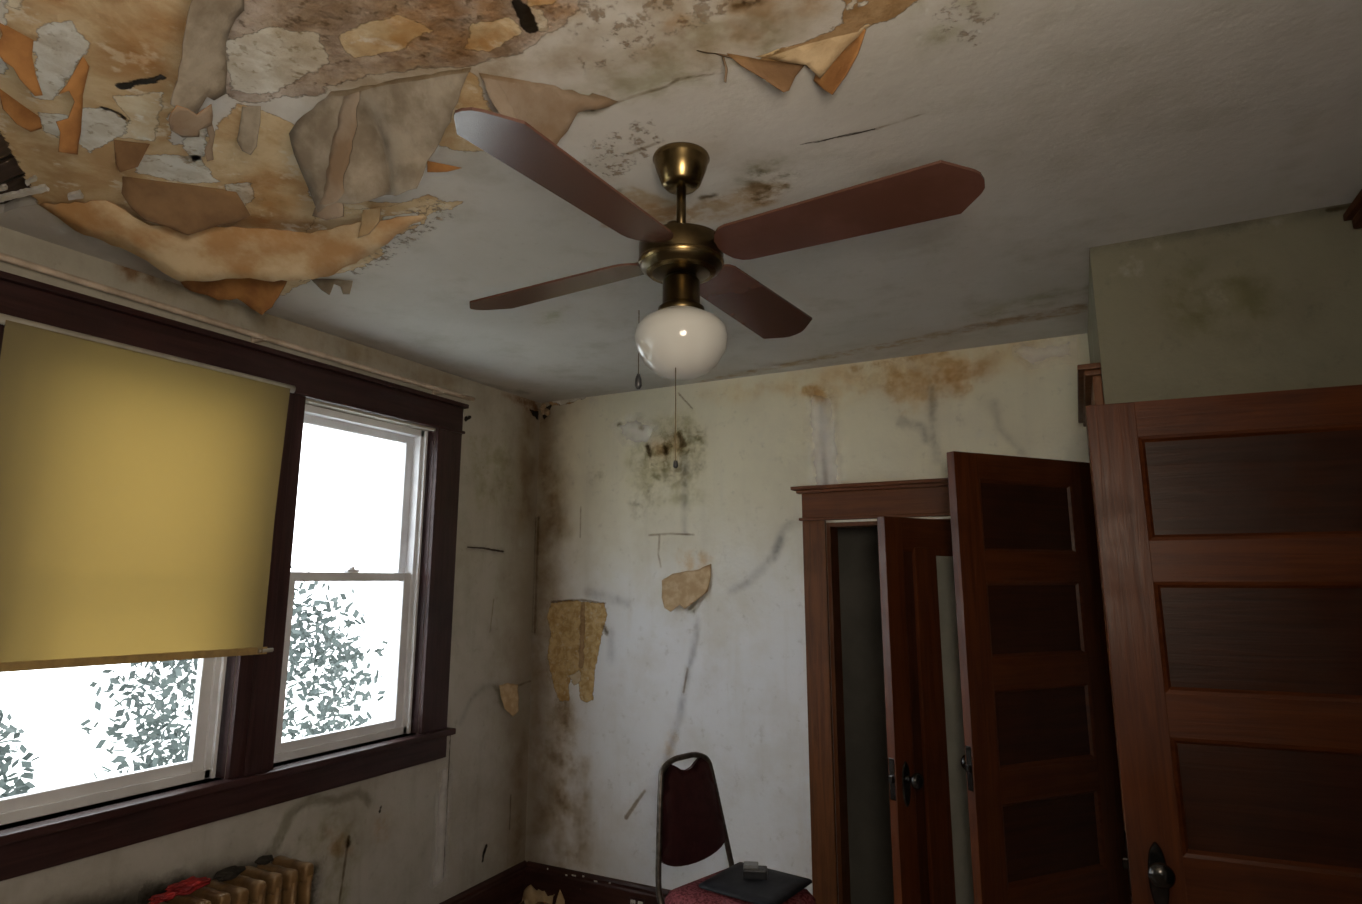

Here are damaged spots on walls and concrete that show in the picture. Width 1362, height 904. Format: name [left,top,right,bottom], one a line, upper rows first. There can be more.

flaking render [0,0,760,274]
water stain [632,428,685,456]
peeling [662,564,711,612]
flaking render [547,600,607,702]
peeling [499,683,519,717]